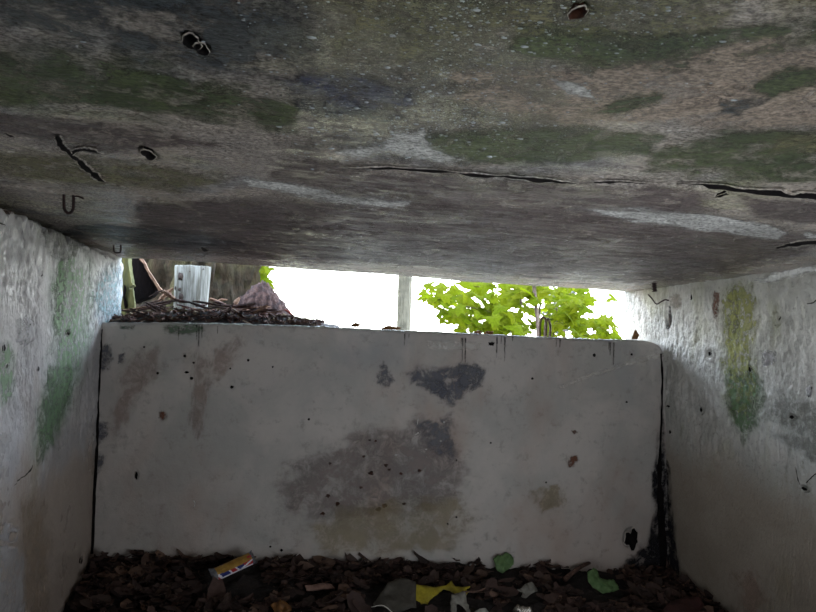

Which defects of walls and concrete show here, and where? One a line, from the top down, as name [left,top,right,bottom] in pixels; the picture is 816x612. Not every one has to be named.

crack [54,135,106,182]
crack [348,166,655,185]
crack [677,182,816,201]
crack [776,239,816,249]
damp [187,323,644,405]
damp [287,419,458,518]
damp [626,419,679,574]